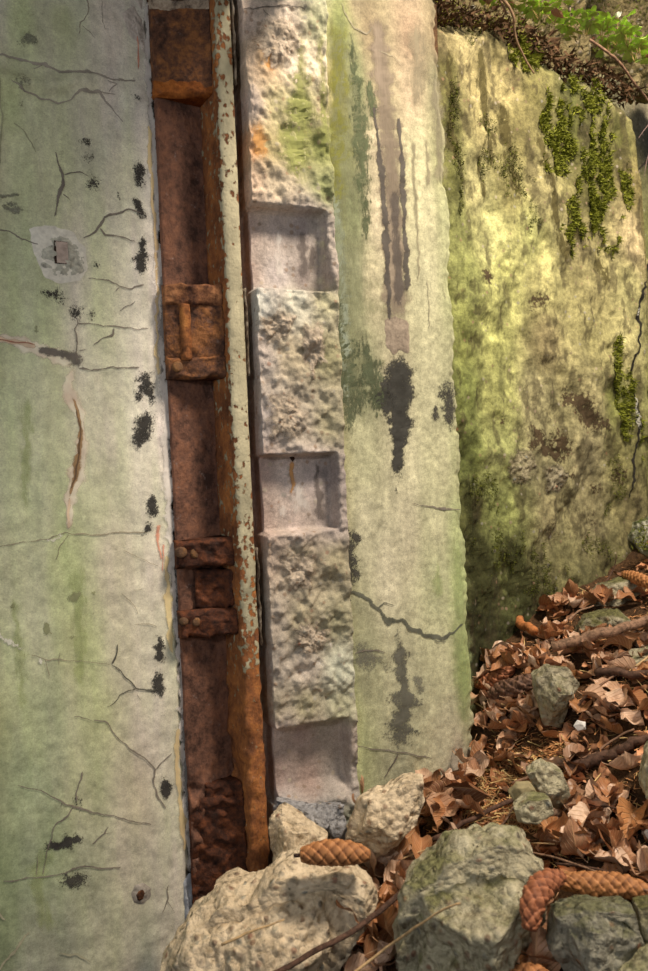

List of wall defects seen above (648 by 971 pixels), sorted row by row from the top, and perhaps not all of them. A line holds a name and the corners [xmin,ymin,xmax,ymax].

water stain [318,21,461,319]
spalling [29,225,88,284]
water stain [338,244,417,494]
water stain [431,380,459,431]
crack [629,263,648,497]
rust [192,567,234,609]
crack [351,590,463,642]
water stain [384,629,424,751]
rust [188,775,247,904]